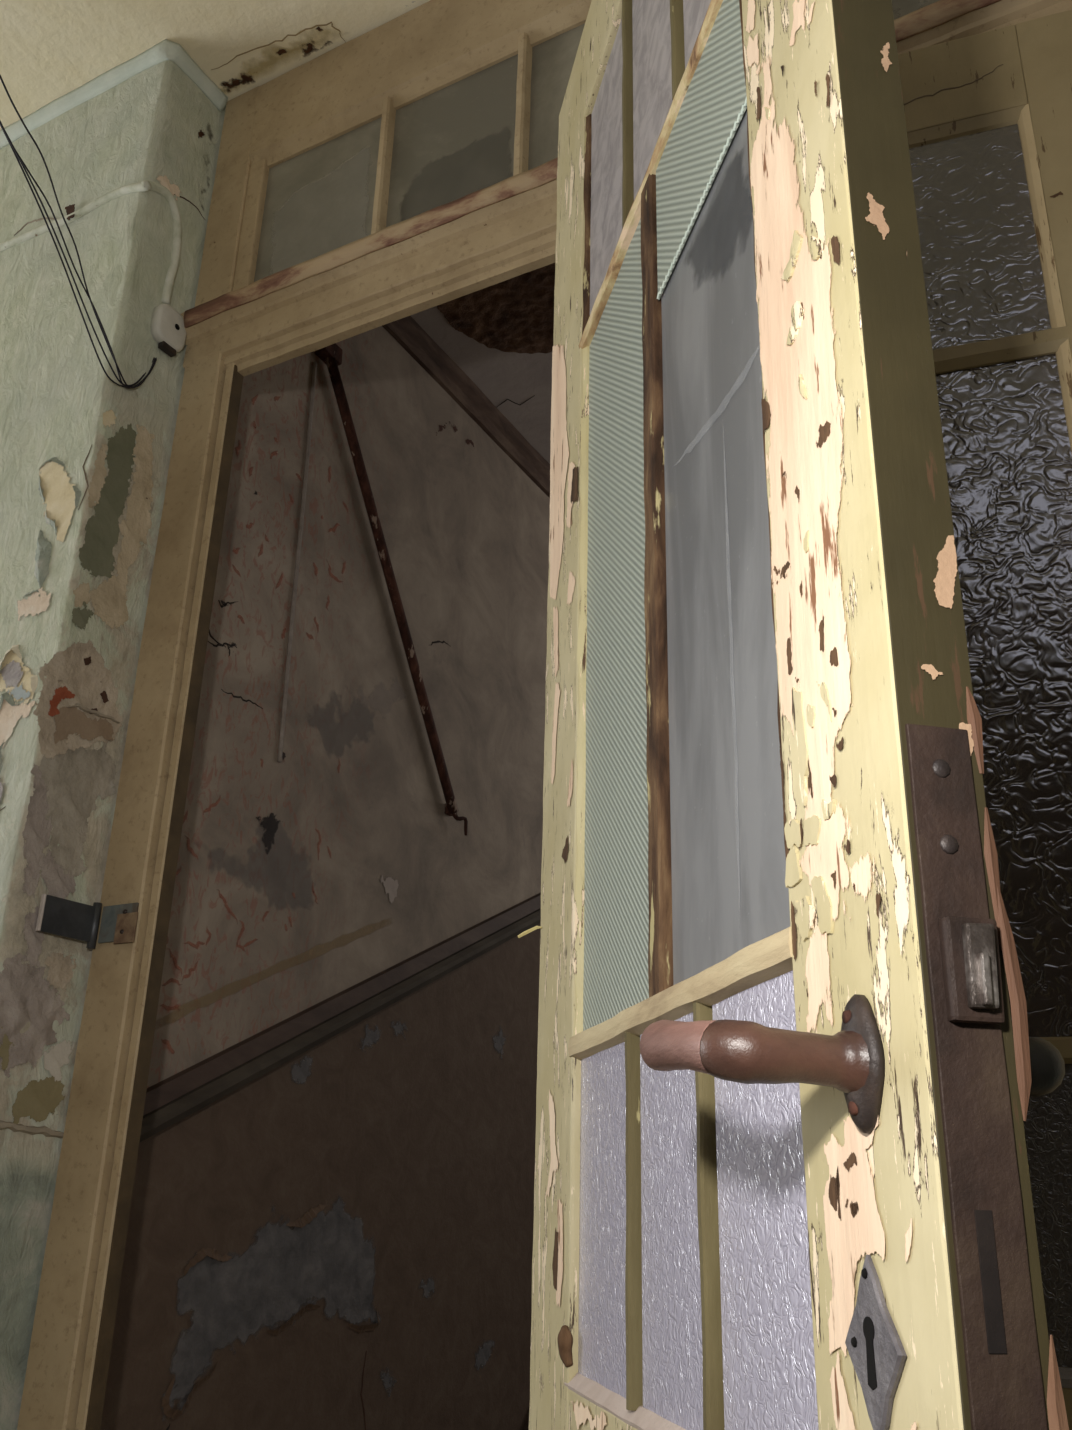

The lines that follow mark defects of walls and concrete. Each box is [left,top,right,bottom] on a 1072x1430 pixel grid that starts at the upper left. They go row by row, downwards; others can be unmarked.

flaking render [437,263,555,354]
peeling [38,409,137,578]
peeling [17,587,51,621]
flaking render [0,601,123,899]
flaking render [0,952,77,1124]
peeling [162,1197,380,1420]